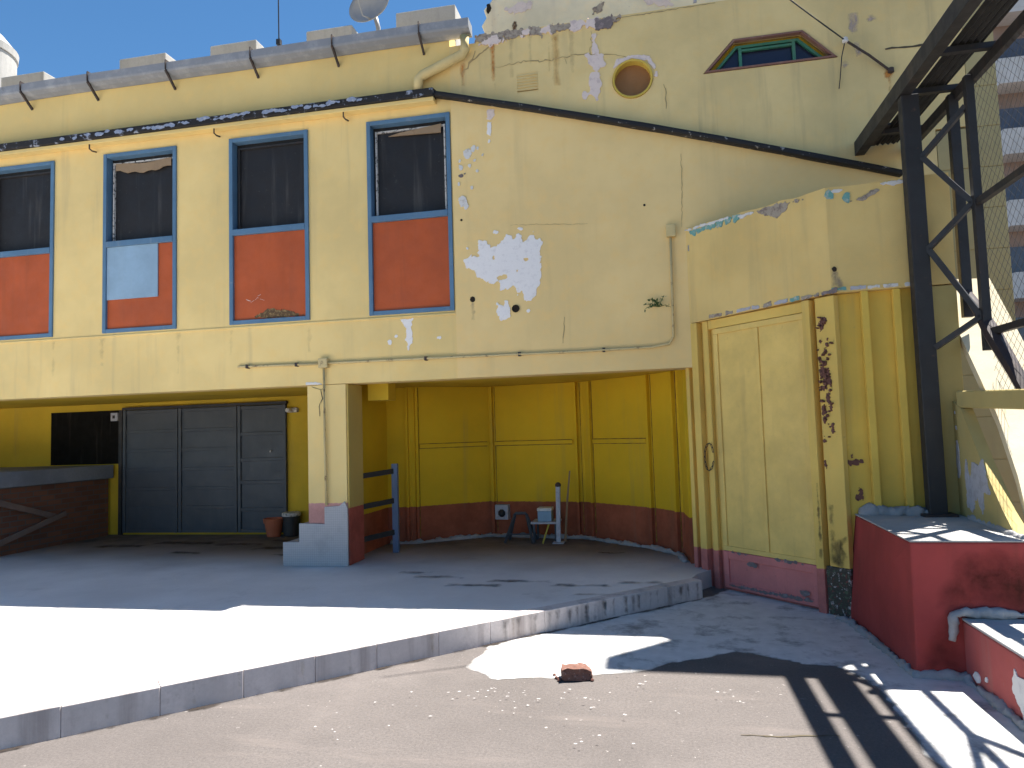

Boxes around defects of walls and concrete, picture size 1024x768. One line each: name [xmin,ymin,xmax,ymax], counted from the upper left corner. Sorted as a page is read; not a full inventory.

spalling [474,1,658,101]
peeling [59,97,362,141]
peeling [458,109,495,221]
peeling [685,199,803,236]
peeling [824,179,903,203]
peeling [463,227,543,321]
peeling [387,318,414,350]
peeling [815,317,835,443]
peeling [954,411,991,514]